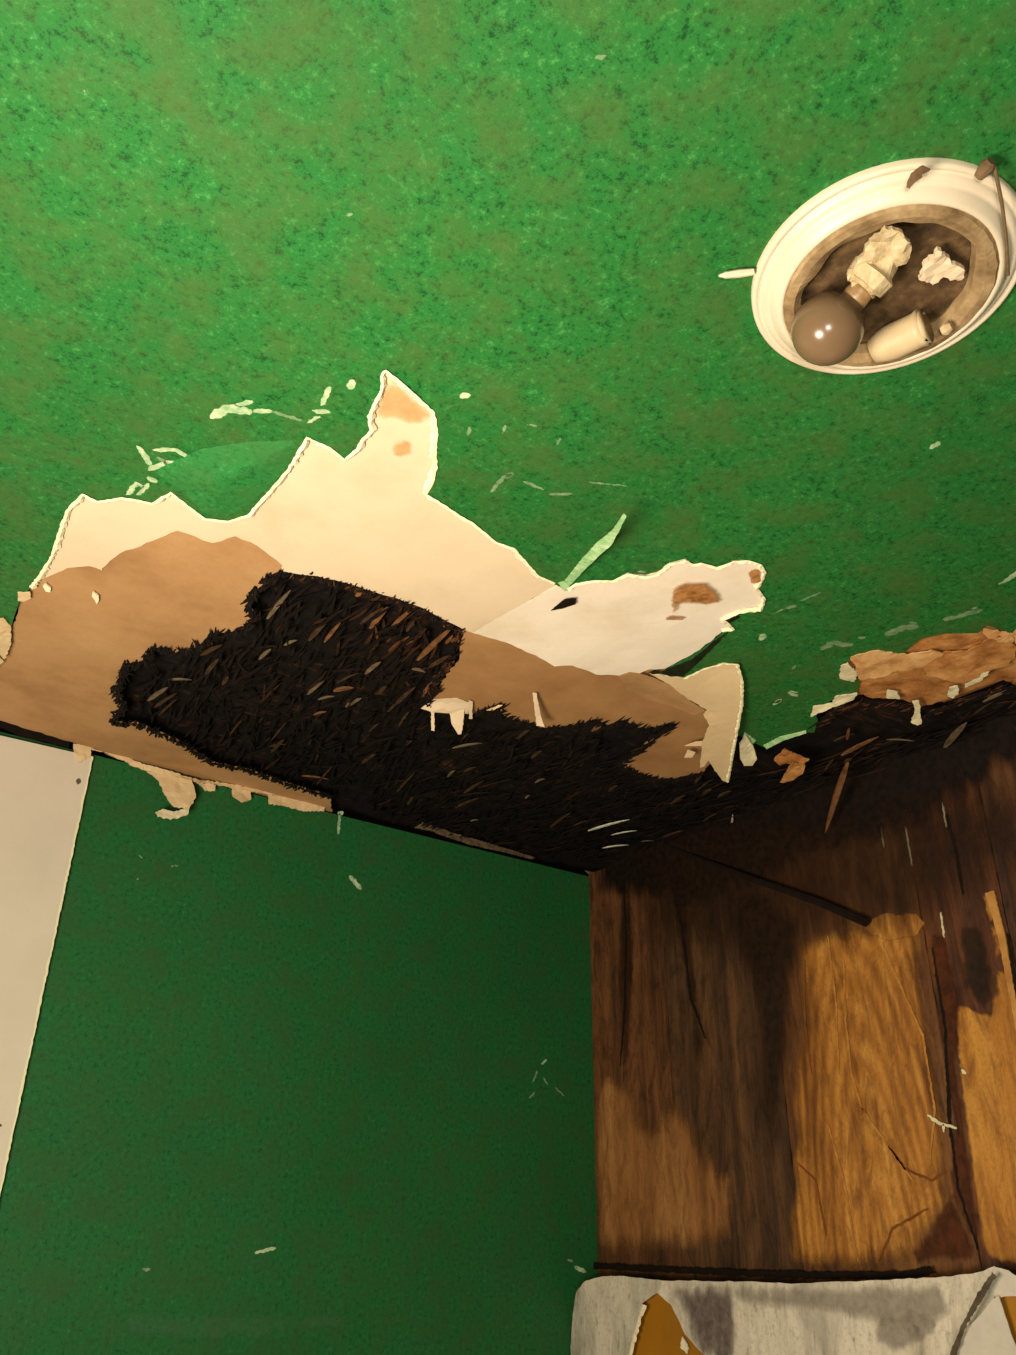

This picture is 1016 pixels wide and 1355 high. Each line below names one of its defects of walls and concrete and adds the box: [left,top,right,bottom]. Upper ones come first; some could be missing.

peeling [18,370,820,677]
peeling [0,617,12,665]
peeling [943,607,982,621]
peeling [947,671,989,698]
peeling [73,744,344,835]
peeling [414,822,534,859]
leakage [601,710,1016,1138]
peeling [568,890,1016,1355]
leakage [915,929,988,1261]
crack [932,948,996,1355]
leakage [684,1289,943,1355]